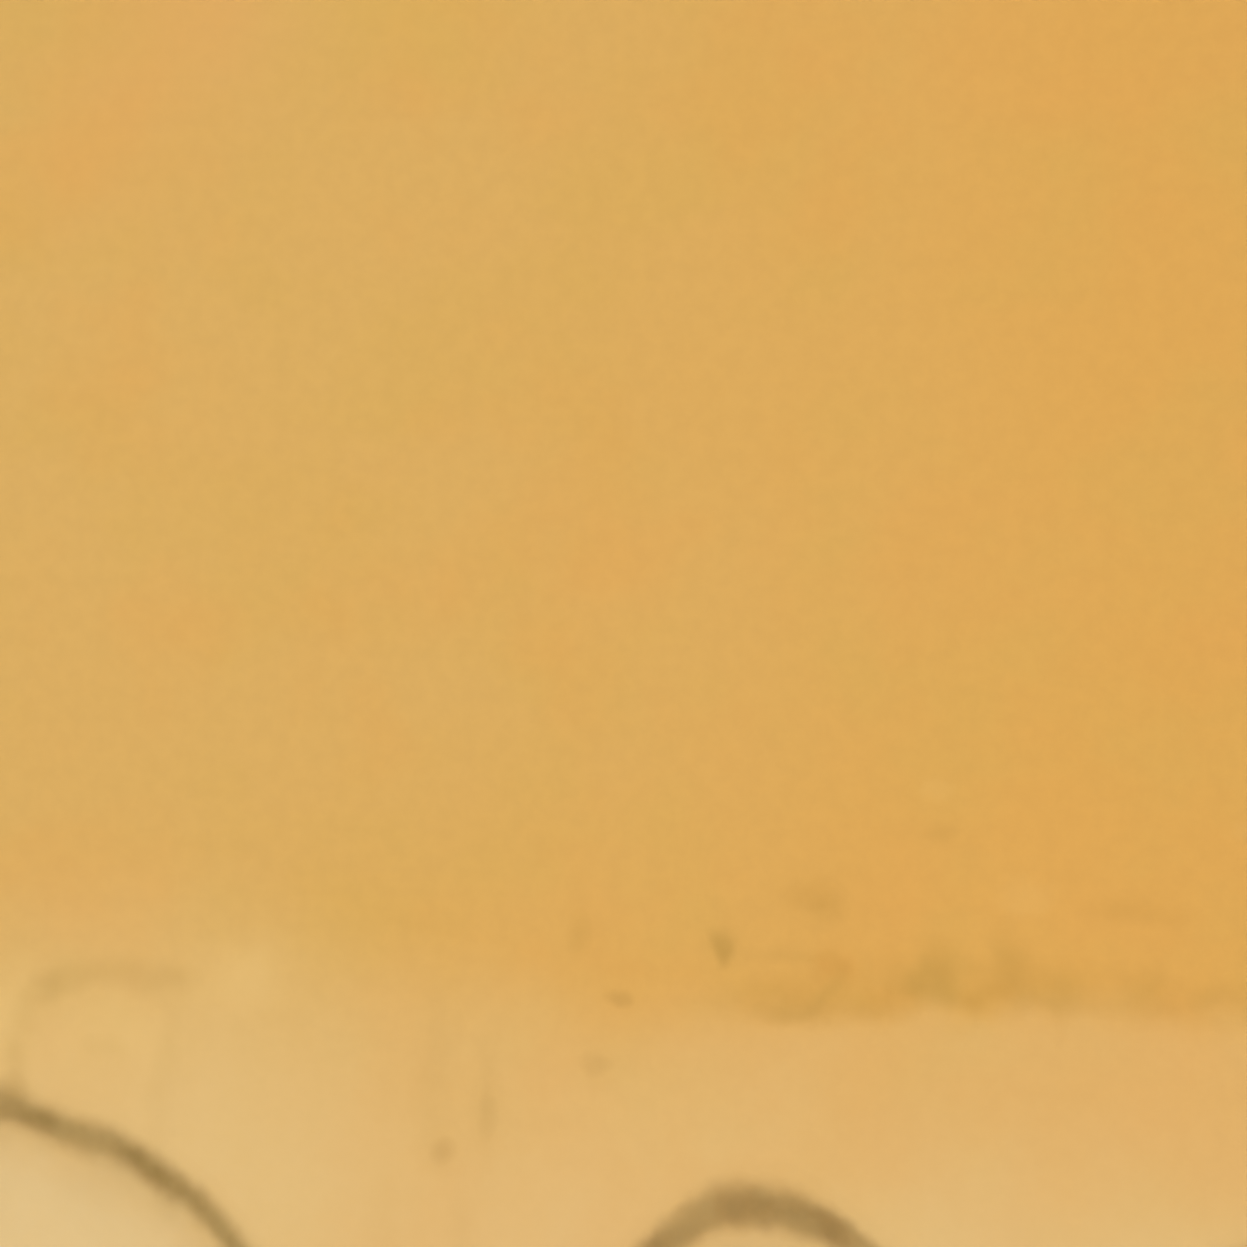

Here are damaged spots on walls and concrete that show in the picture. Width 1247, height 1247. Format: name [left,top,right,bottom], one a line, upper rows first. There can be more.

water stain [0,836,1247,1247]